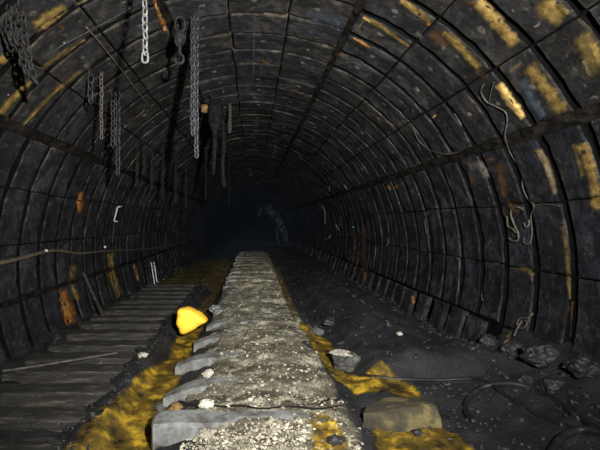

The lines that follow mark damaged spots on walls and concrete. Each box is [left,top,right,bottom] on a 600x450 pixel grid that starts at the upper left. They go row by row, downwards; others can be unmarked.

rust [57,287,75,325]